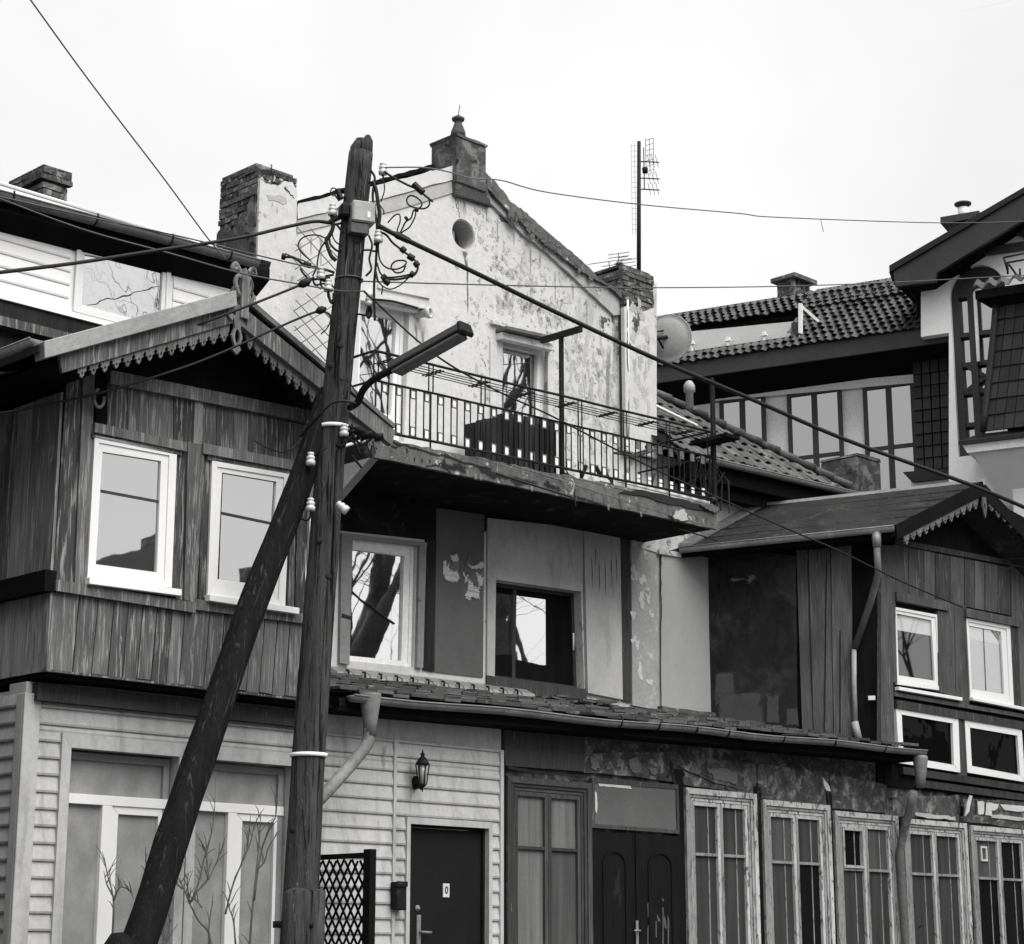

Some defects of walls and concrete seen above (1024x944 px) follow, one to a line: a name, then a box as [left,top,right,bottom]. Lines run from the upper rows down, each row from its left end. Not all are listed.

flaking render [257,175,288,221]
peeling [465,196,653,448]
peeling [442,554,485,600]
peeling [630,549,654,620]
peeling [630,635,653,686]